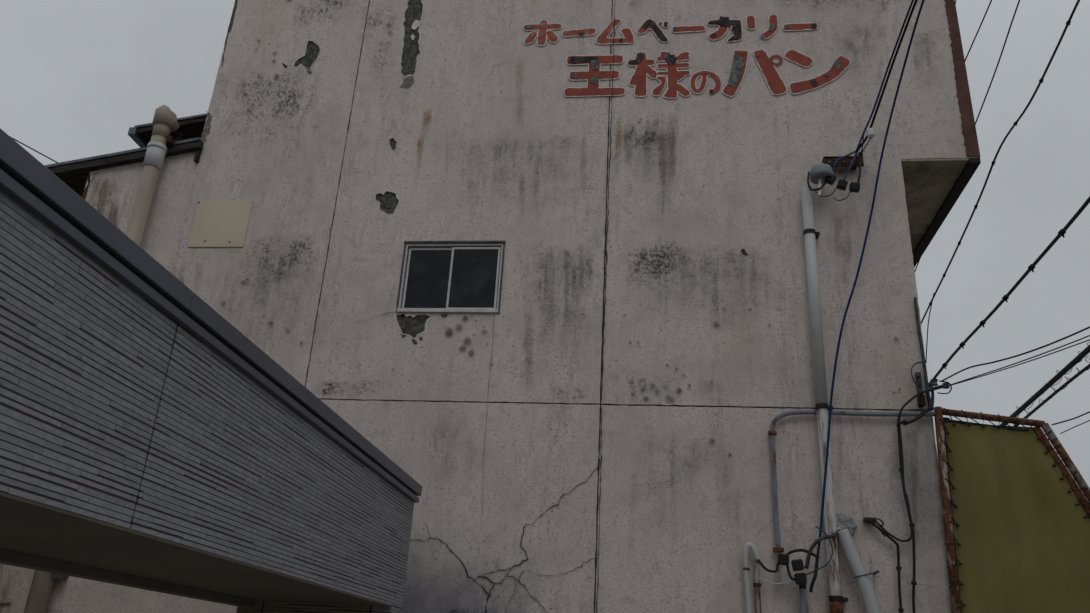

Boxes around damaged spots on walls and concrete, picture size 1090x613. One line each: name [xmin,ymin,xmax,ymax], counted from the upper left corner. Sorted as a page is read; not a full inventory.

spalling [282,35,321,75]
spalling [399,0,423,89]
spalling [374,190,400,215]
spalling [395,313,448,344]
damp [446,316,488,355]
crack [410,4,616,613]